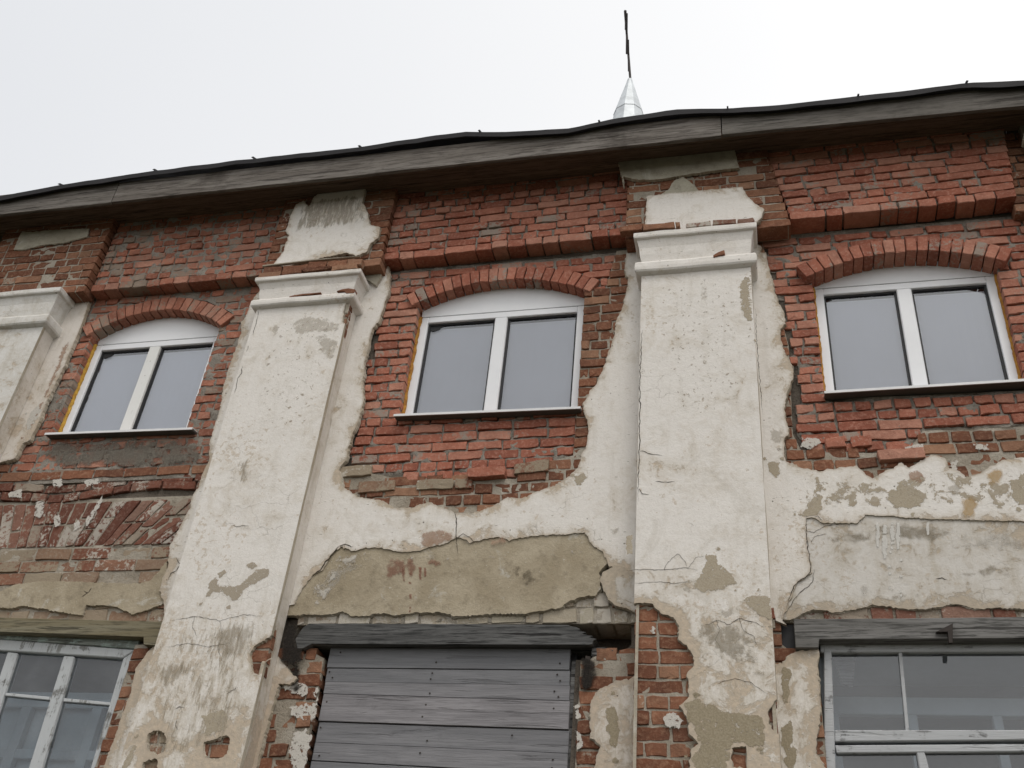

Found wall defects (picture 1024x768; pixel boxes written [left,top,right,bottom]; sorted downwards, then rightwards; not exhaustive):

flaking render [251,150,791,514]
flaking render [0,219,206,592]
flaking render [763,286,1024,523]
flaking render [0,604,164,622]
crack [171,614,261,654]
peeling [199,562,269,609]
flaking render [250,626,329,768]
flaking render [297,547,1024,768]
crack [627,554,703,584]
crack [706,516,838,649]